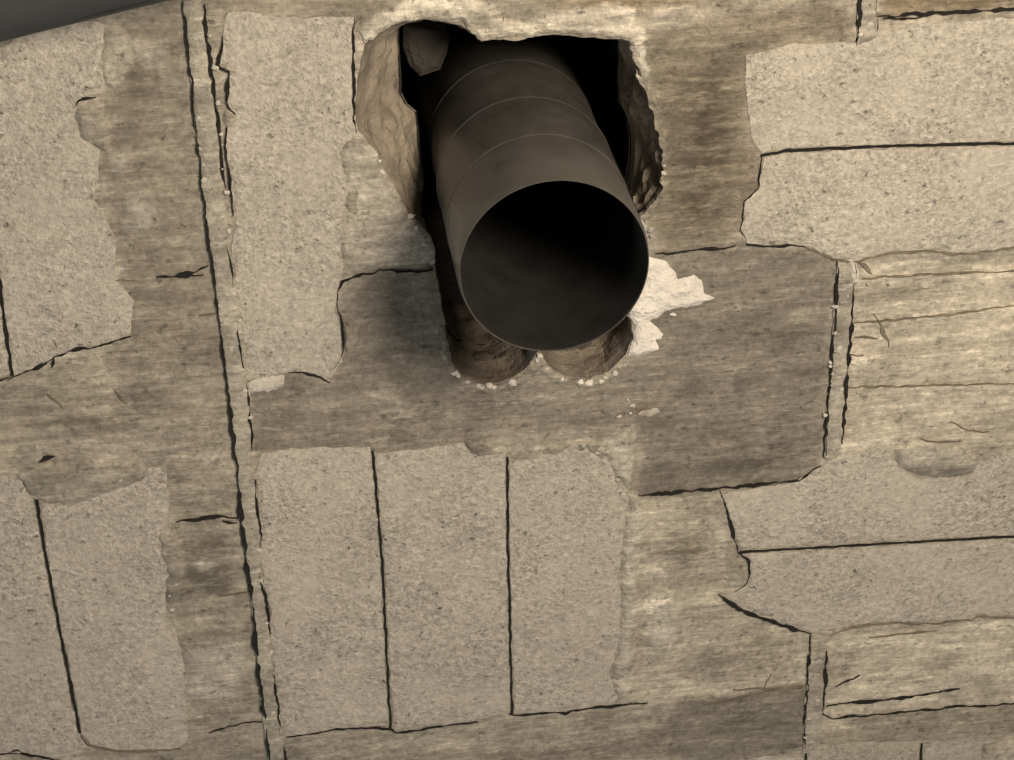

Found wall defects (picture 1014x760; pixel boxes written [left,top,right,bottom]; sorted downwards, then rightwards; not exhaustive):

crack [76,97,96,106]
peeling [75,101,112,152]
spalling [340,0,670,395]
spalling [848,259,870,286]
crack [0,335,132,382]
crack [116,3,478,760]
peeling [465,440,499,456]
peeling [542,398,659,492]
crack [639,157,1014,747]
crack [509,703,648,717]
crack [0,749,56,760]
crack [80,736,181,753]